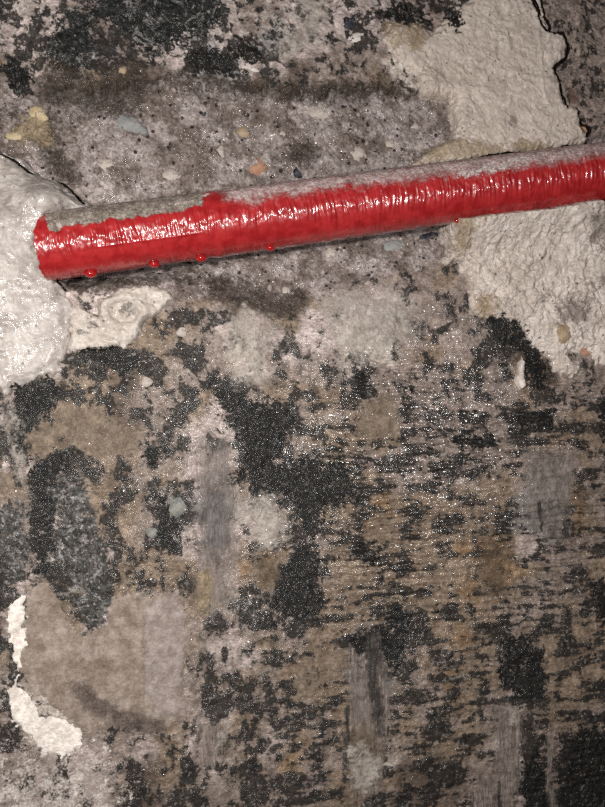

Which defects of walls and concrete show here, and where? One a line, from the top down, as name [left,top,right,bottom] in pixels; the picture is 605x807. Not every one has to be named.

leakage [0,0,329,185]
leakage [444,8,465,34]
crack [471,150,520,158]
crack [532,0,592,147]
leakage [0,370,117,636]
leakage [66,271,363,629]
leakage [448,430,498,453]
leakage [477,312,558,432]
leakage [0,734,140,807]
peeling [6,580,192,759]
leakage [338,600,414,807]
leakage [472,629,605,807]